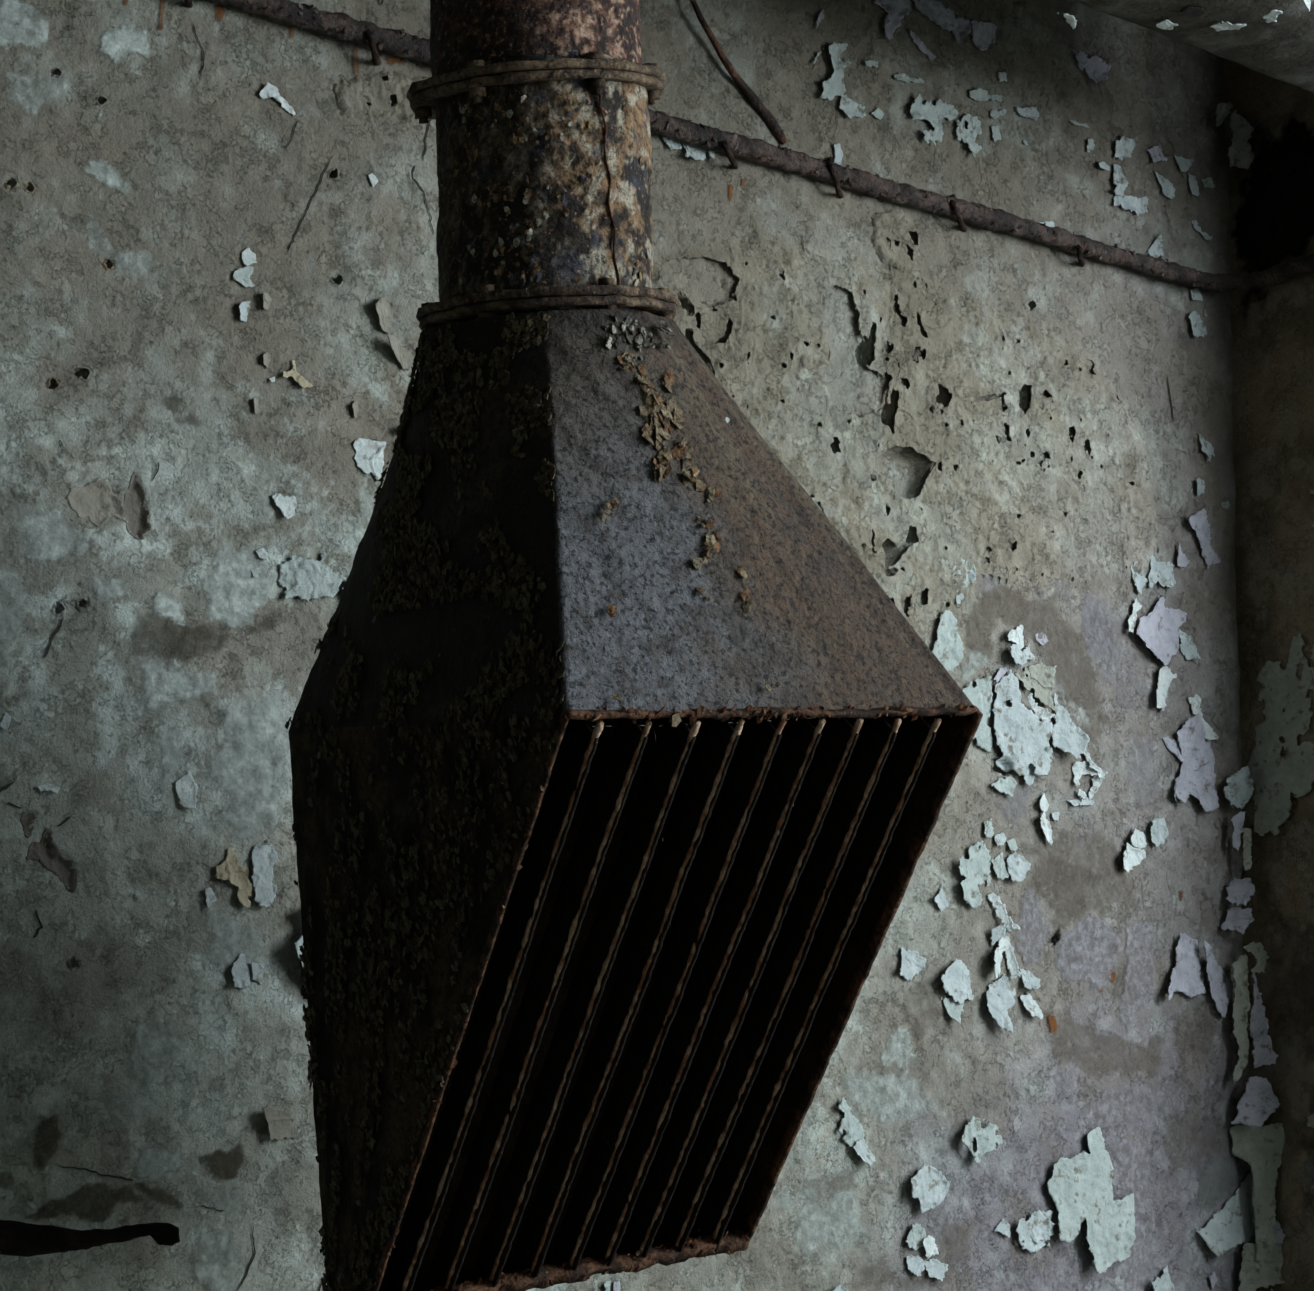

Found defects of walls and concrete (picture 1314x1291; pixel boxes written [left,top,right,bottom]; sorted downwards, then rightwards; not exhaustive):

peeling [812,42,884,120]
peeling [893,72,1039,158]
peeling [1069,120,1215,216]
water stain [1232,119,1314,273]
peeling [932,559,977,675]
peeling [1128,478,1221,711]
peeling [204,839,278,909]
peeling [285,297,566,1291]
peeling [962,624,1108,846]
peeling [1123,817,1169,872]
peeling [1162,632,1314,1291]
peeling [993,1127,1136,1274]